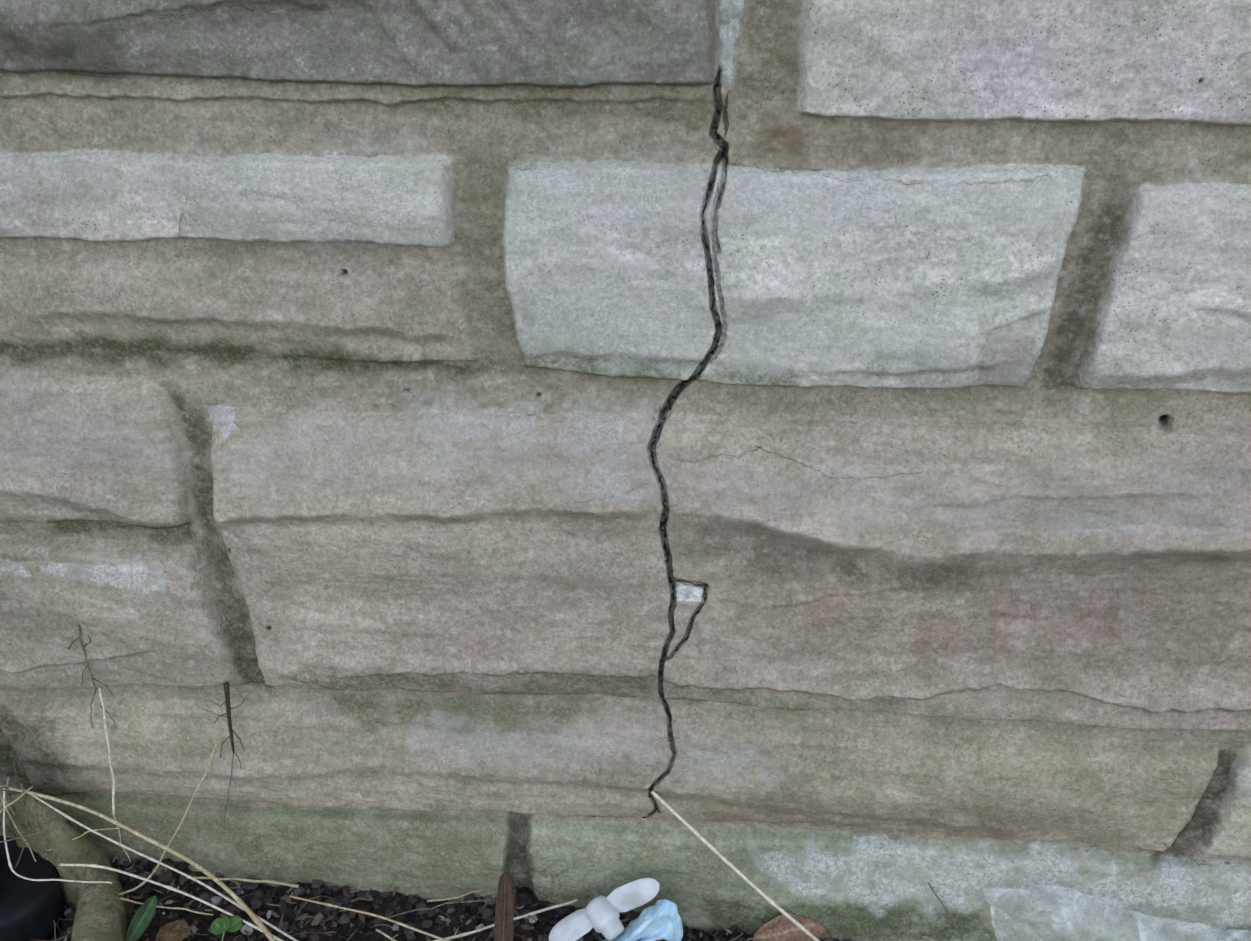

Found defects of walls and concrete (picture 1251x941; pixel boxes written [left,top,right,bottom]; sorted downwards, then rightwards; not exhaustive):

crack [578,70,1050,818]
water stain [505,812,537,900]
water stain [761,835,1251,932]